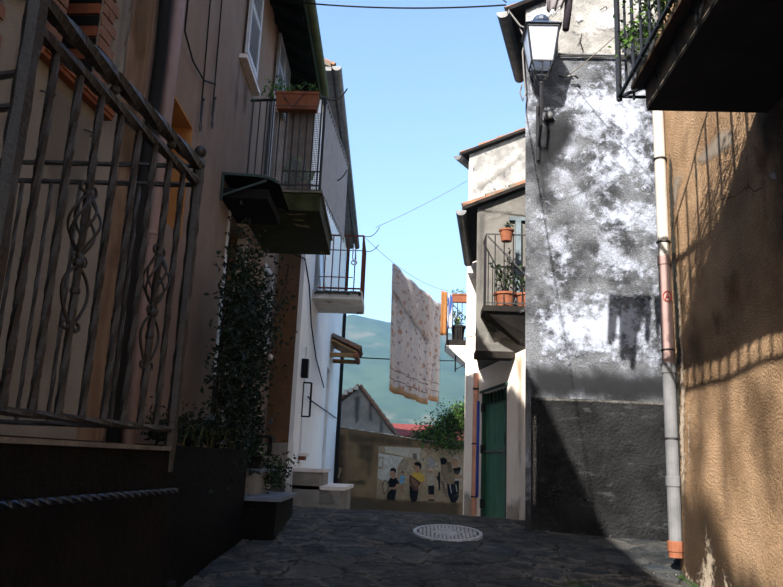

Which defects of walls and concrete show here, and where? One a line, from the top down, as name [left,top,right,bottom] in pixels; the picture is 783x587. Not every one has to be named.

damp [539,123,570,180]
damp [533,367,663,399]
spalling [686,535,715,587]